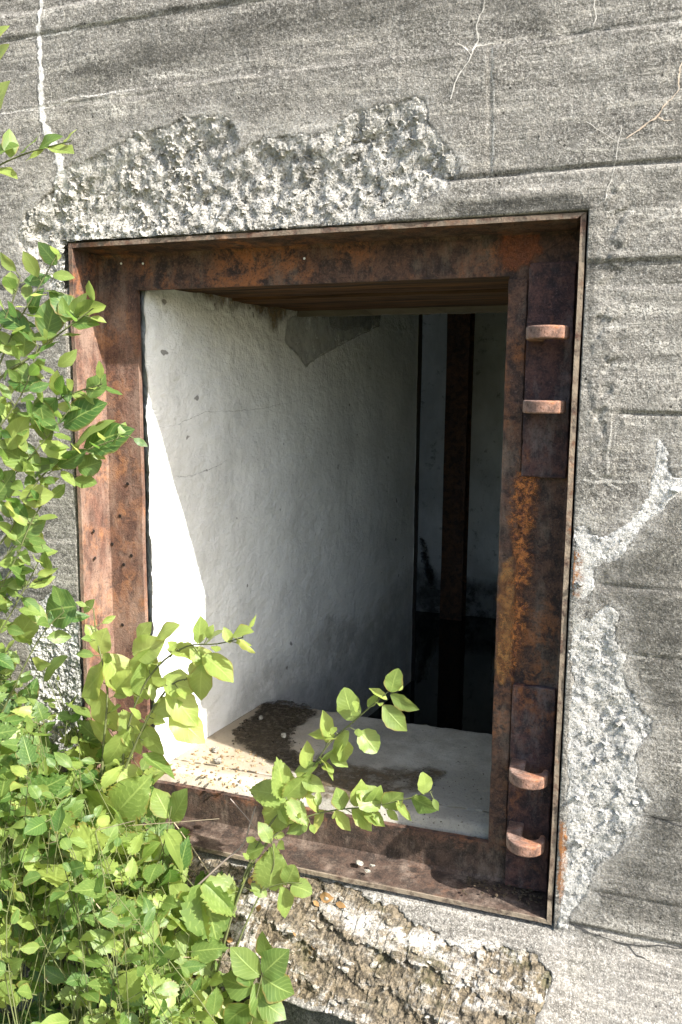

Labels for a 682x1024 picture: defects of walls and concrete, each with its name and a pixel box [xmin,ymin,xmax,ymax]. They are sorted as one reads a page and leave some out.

crack [450,0,494,99]
spalling [15,97,466,293]
crack [587,63,682,200]
rust [496,473,538,684]
rust [572,552,584,596]
peeling [573,439,682,600]
spalling [557,605,653,929]
spalling [185,852,552,1024]
rust [557,823,569,899]